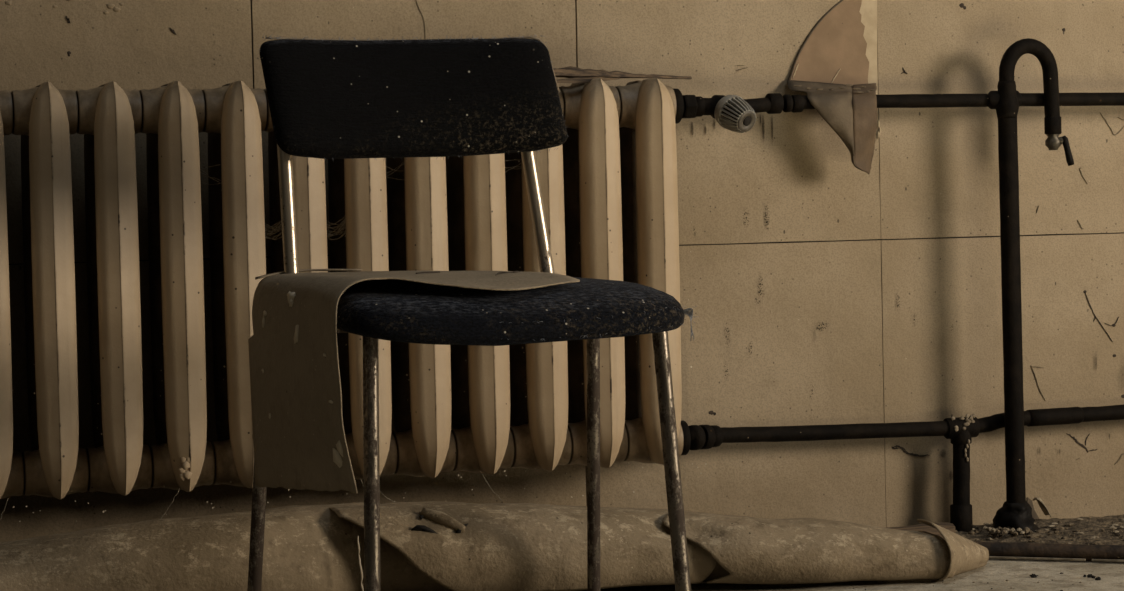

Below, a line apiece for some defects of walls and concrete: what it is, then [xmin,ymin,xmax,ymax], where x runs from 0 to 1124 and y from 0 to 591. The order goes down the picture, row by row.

flaking render [859,0,878,95]